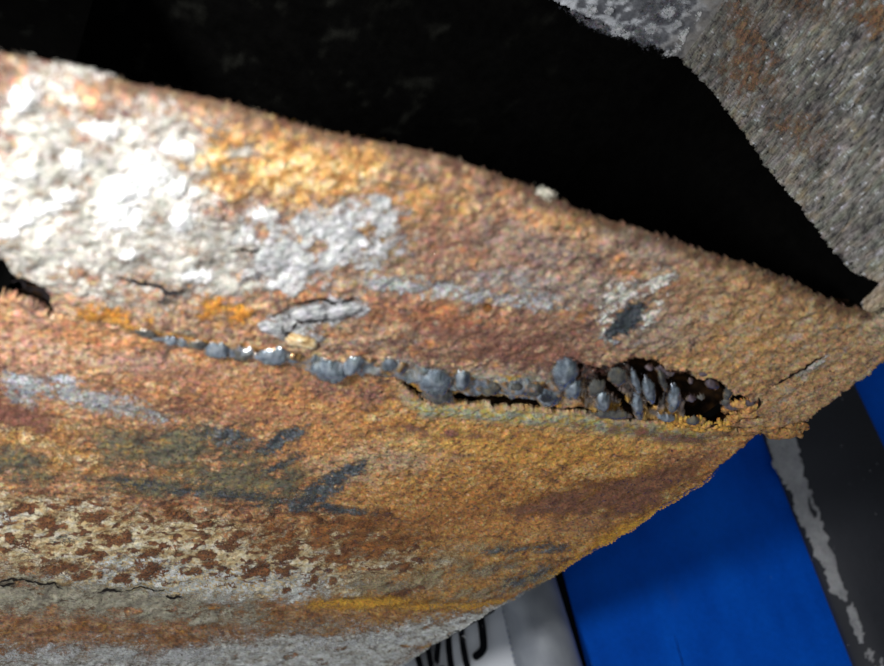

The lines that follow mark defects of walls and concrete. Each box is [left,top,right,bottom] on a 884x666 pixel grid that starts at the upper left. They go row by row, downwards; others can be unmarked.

peeling [0,54,418,319]
corrosion [177,115,391,226]
corrosion [74,303,130,324]
corrosion [181,294,258,329]
peeling [257,301,363,349]
corrosion [387,318,603,377]
corrosion [0,381,113,484]
corrosion [566,421,716,443]
corrosion [480,454,716,582]
crack [0,578,62,589]
crack [98,586,182,599]
corrosion [0,487,516,656]